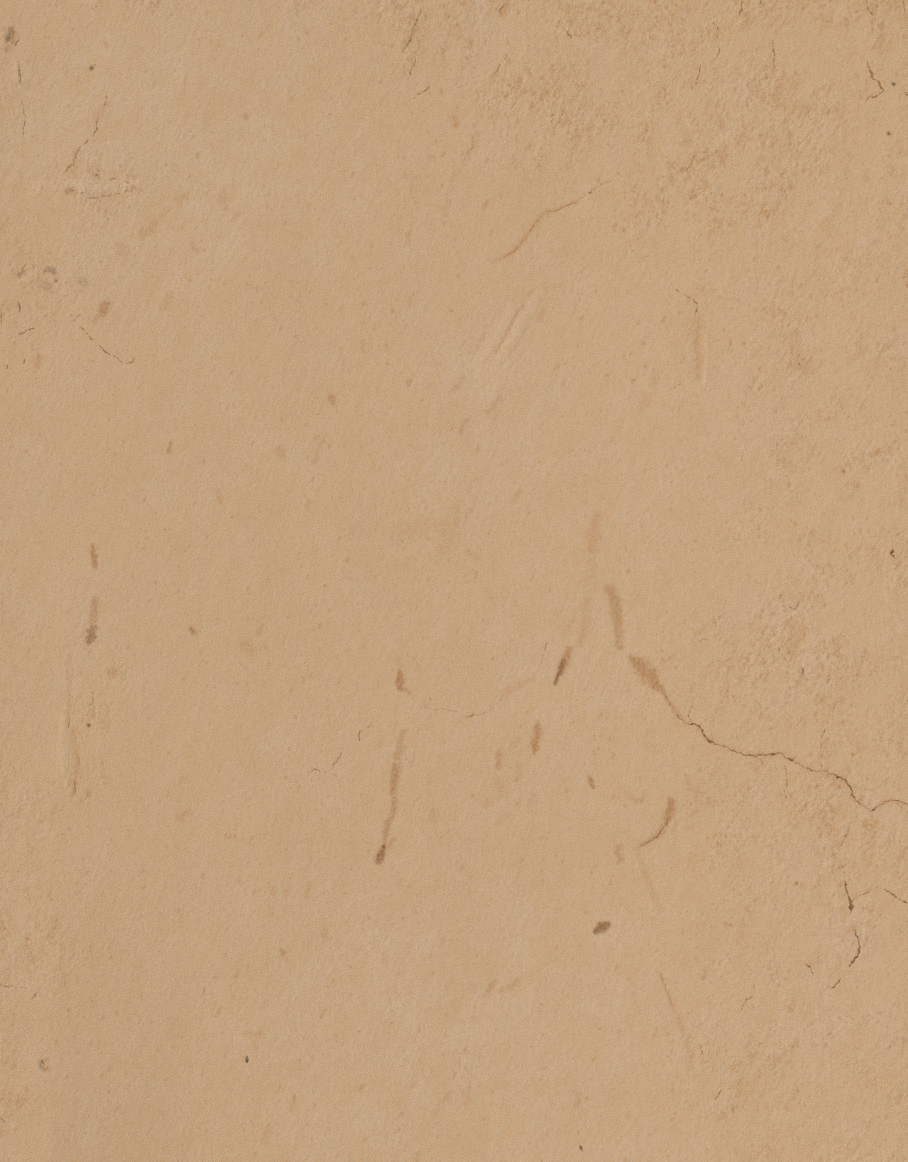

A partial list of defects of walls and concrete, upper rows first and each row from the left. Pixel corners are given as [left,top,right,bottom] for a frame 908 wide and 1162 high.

crack [665,696,908,989]